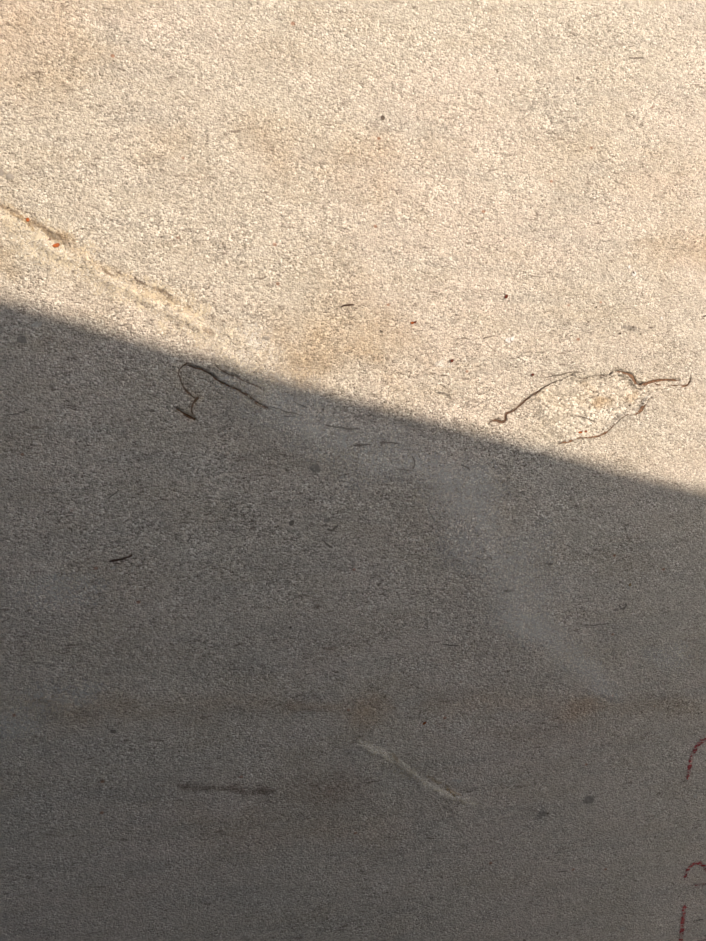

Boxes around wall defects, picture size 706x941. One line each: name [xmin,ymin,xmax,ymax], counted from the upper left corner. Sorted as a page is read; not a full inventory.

crack [178,363,307,417]